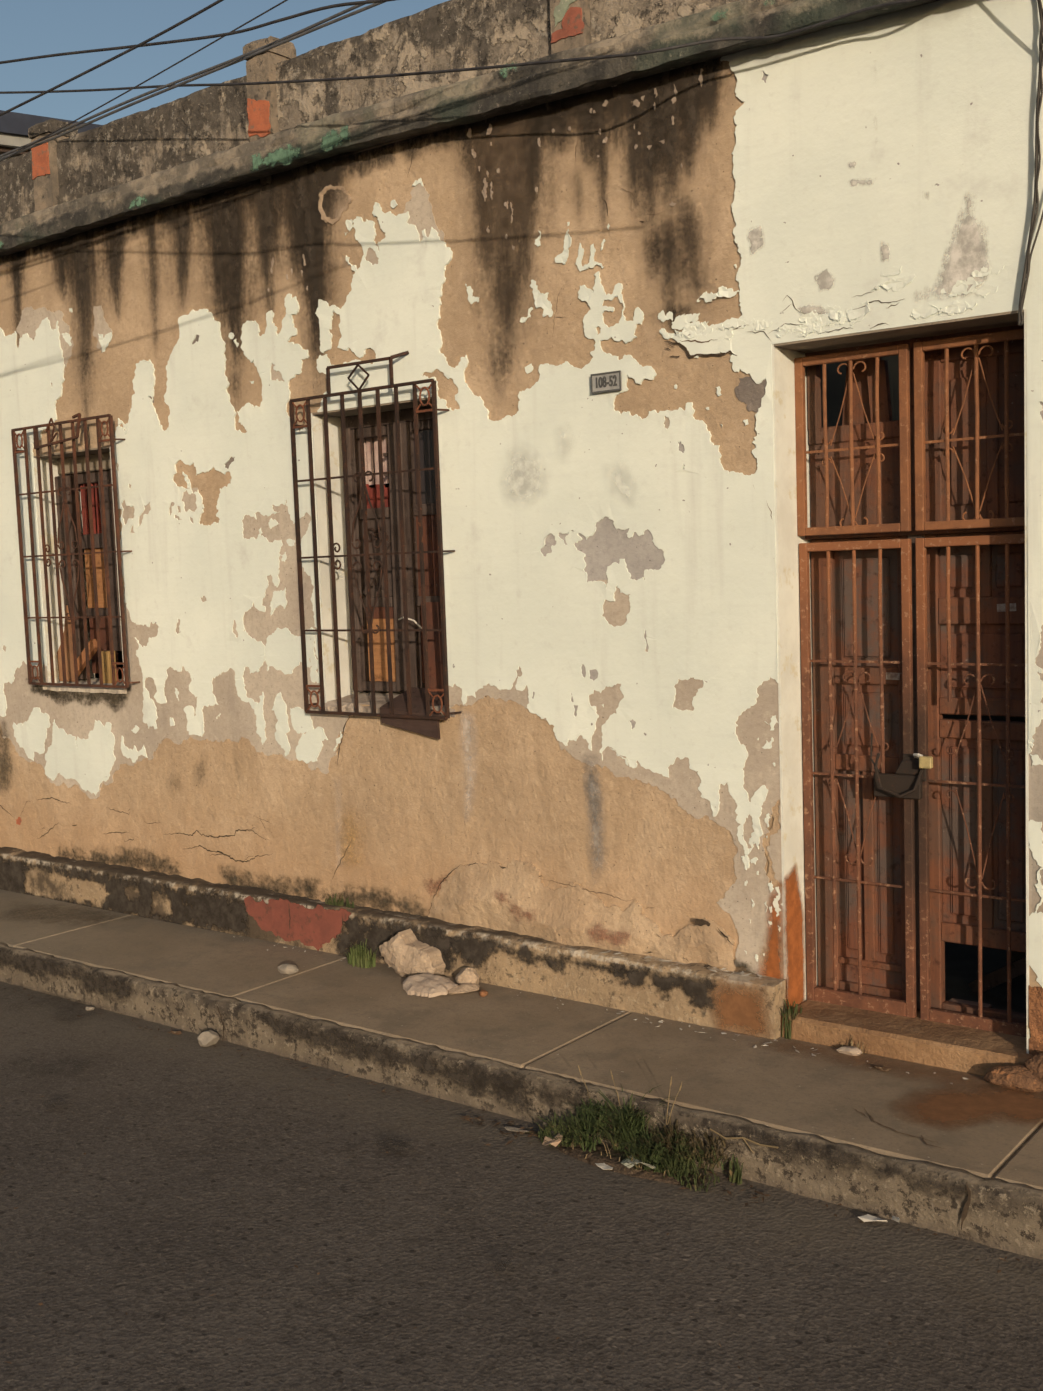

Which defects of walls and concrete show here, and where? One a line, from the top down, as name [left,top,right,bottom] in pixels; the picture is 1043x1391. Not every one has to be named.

water stain [11,58,718,343]
peeling [0,57,916,475]
peeling [911,265,1008,319]
peeling [121,484,151,533]
peeling [169,457,235,526]
peeling [1035,625,1043,681]
water stain [0,735,10,787]
flaking render [0,500,784,979]
crack [0,797,265,863]
peeling [1028,698,1043,916]
water stain [0,856,248,936]
flaking render [1029,965,1043,1056]